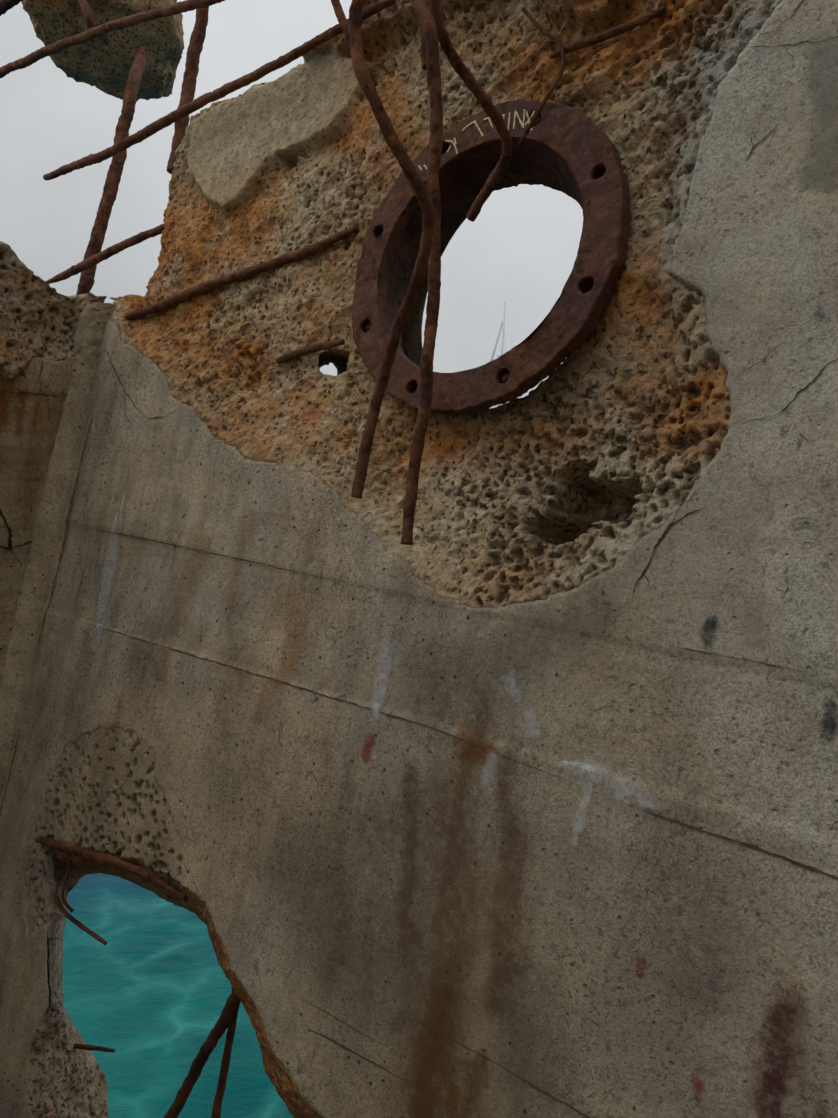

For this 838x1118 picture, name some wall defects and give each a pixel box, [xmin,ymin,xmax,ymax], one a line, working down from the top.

crack [747,0,838,57]
spalling [0,0,783,609]
crack [744,358,838,422]
crack [0,509,32,578]
spalling [28,998,61,1118]
spalling [74,1043,116,1052]
spalling [163,987,241,1118]